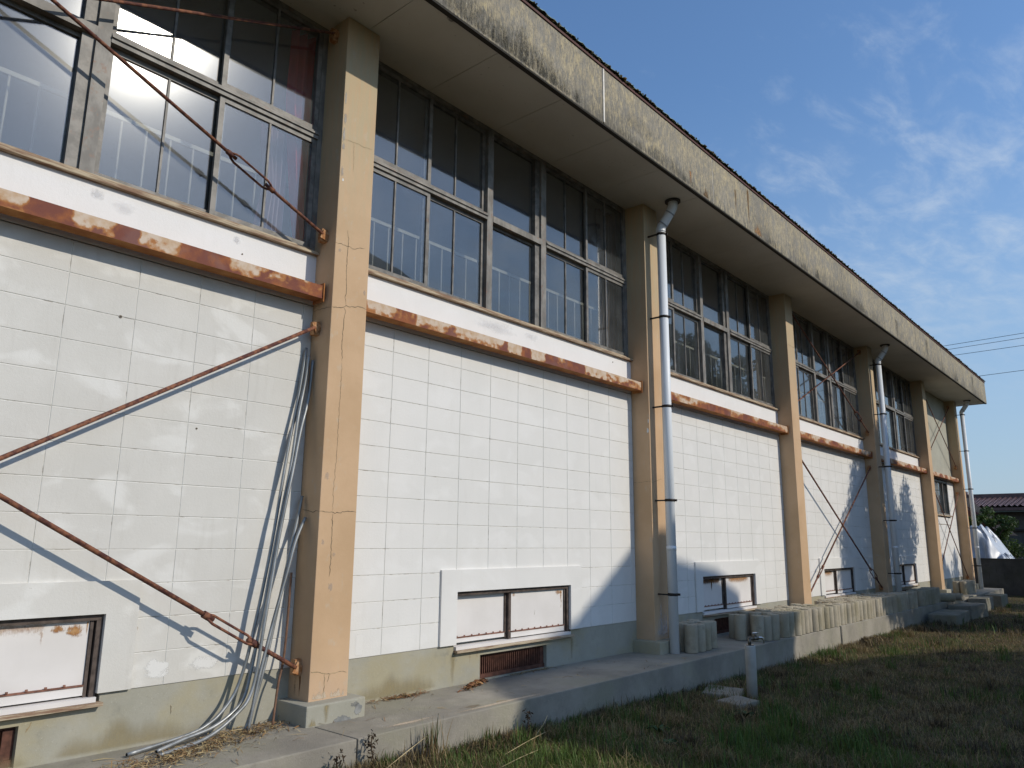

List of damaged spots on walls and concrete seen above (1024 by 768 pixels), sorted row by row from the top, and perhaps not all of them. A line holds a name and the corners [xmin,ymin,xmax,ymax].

crack [303,237,365,575]
corrosion [51,622,89,636]